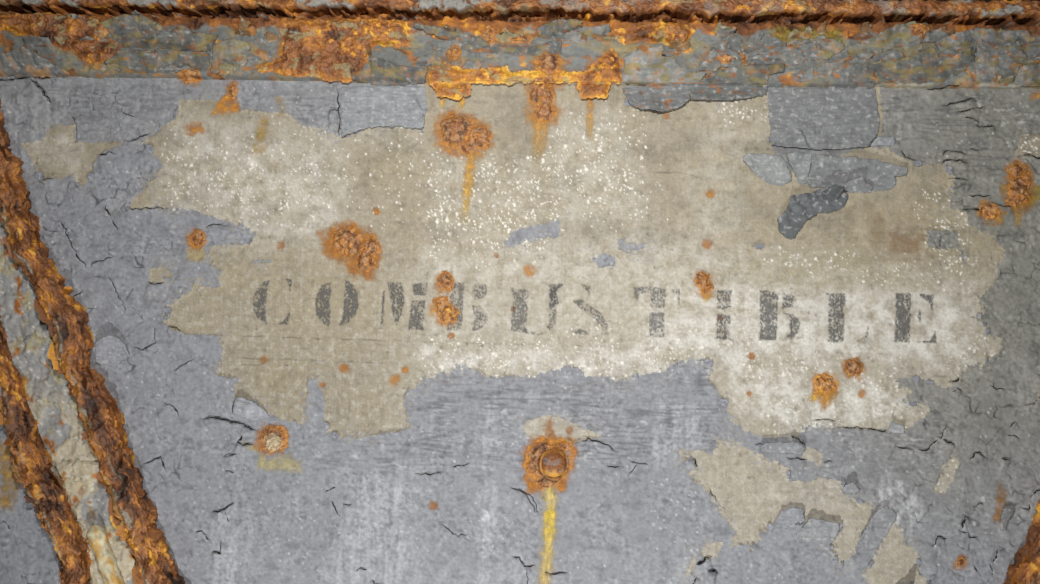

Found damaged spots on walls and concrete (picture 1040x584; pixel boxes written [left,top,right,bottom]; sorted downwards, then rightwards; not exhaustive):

corrosion [0,12,123,67]
corrosion [256,17,412,84]
corrosion [427,18,696,136]
crack [926,84,1011,211]
peeling [120,19,1040,439]
crack [205,406,254,473]
peeling [522,414,601,444]
crack [817,397,1040,460]
peeling [933,455,960,494]
crack [197,502,234,554]
peeling [679,440,929,584]
crack [511,556,568,584]